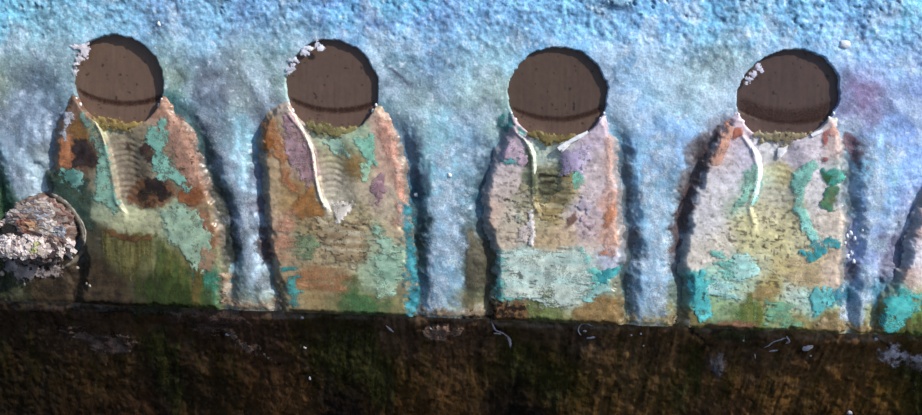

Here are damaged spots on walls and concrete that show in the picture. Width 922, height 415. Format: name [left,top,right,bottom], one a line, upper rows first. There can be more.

peeling [0,199,77,259]
water stain [798,236,841,264]
water stain [726,284,922,352]